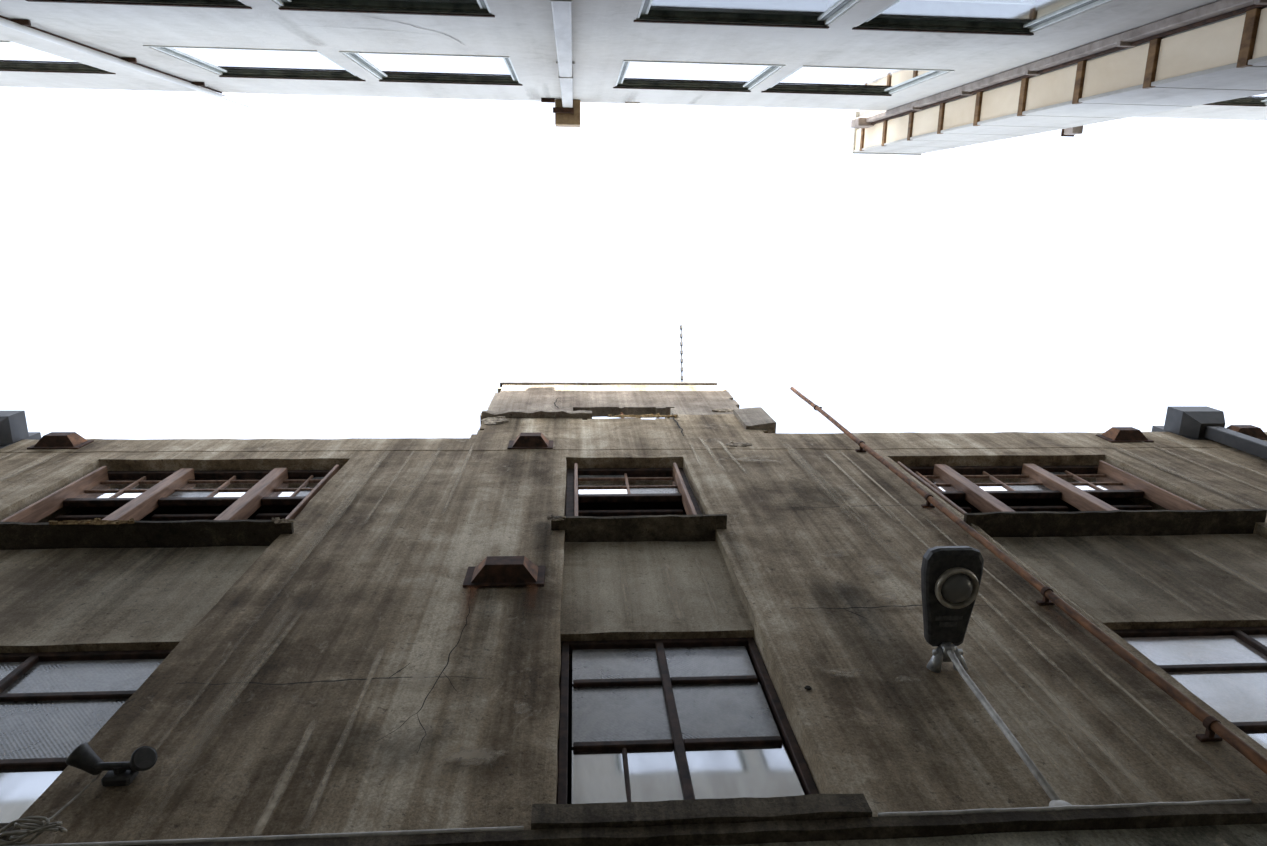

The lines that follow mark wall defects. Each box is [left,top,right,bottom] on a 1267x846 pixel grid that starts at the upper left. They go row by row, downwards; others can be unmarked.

crack [176,587,480,755]